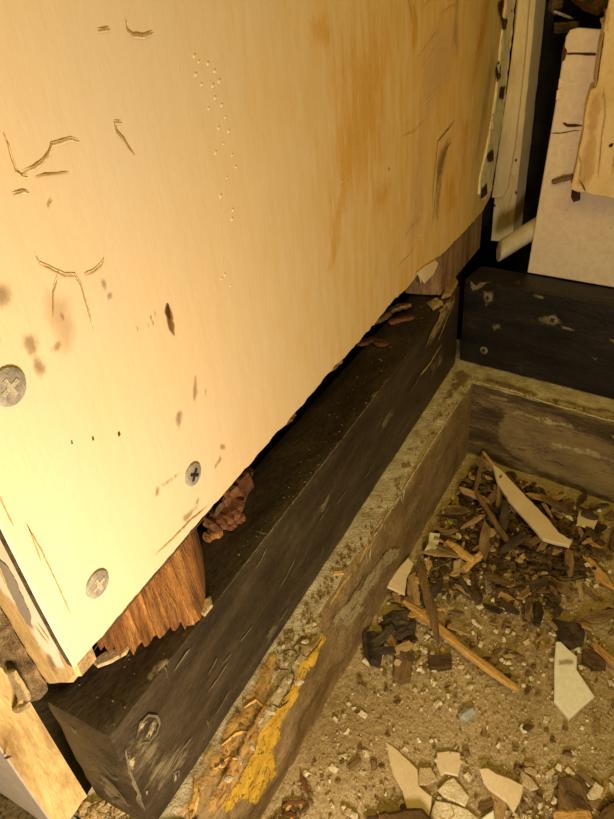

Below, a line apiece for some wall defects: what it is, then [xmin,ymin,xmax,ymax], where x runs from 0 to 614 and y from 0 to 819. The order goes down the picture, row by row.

peeling [0,540,64,673]
spalling [258,615,322,723]
crack [271,636,322,708]